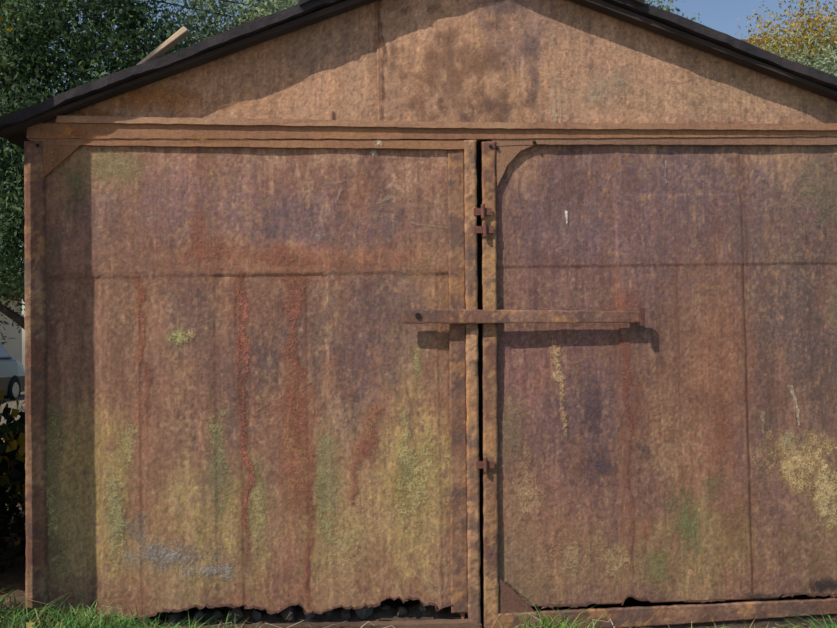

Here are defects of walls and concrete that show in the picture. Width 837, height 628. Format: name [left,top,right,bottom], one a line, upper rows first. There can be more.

corrosion [550,340,567,435]